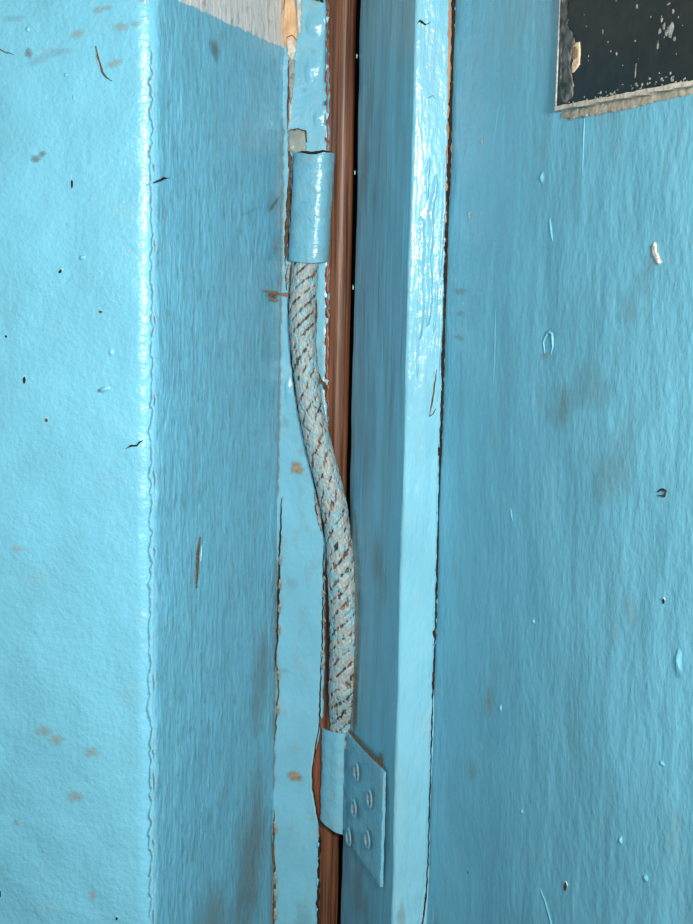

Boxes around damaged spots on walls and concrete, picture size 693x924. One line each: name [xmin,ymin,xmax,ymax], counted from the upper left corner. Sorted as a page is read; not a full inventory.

spalling [283,0,302,103]
peeling [315,0,330,153]
crack [417,0,456,924]
crack [274,499,282,739]
crack [271,814,279,924]